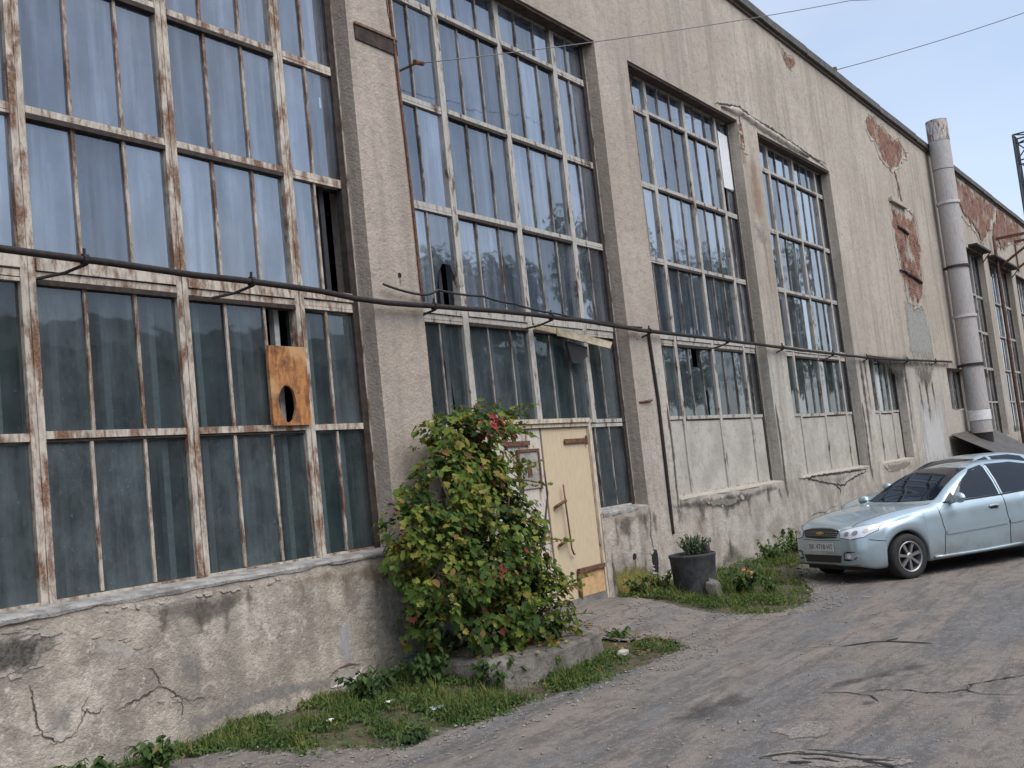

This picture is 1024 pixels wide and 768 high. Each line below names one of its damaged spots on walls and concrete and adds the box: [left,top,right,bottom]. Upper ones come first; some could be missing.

spalling [864,112,908,174]
spalling [955,175,1024,250]
spalling [889,196,925,310]
crack [799,468,868,516]
damp [160,593,252,627]
crack [29,668,205,745]